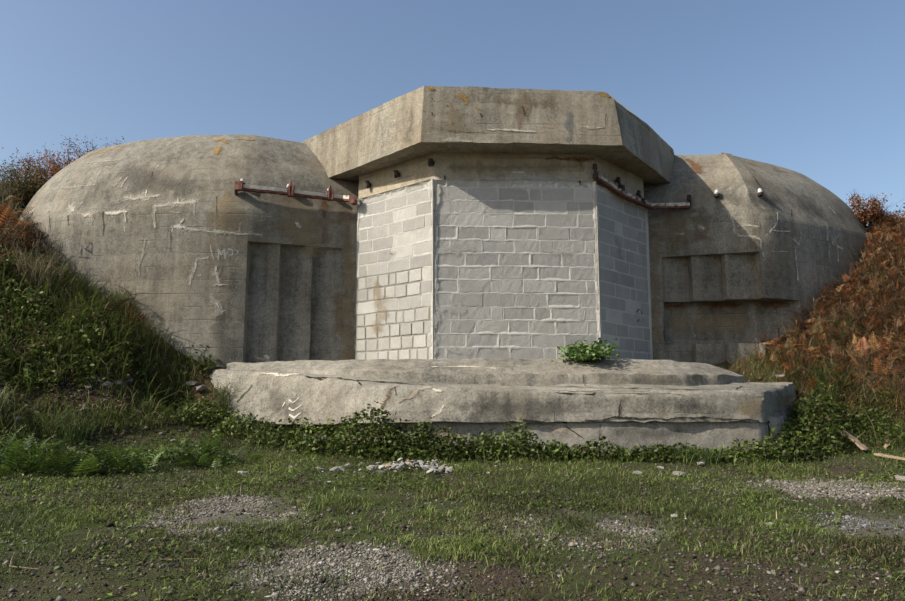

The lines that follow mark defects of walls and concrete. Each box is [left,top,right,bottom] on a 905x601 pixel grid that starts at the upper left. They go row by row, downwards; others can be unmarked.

crack [523,375,771,438]